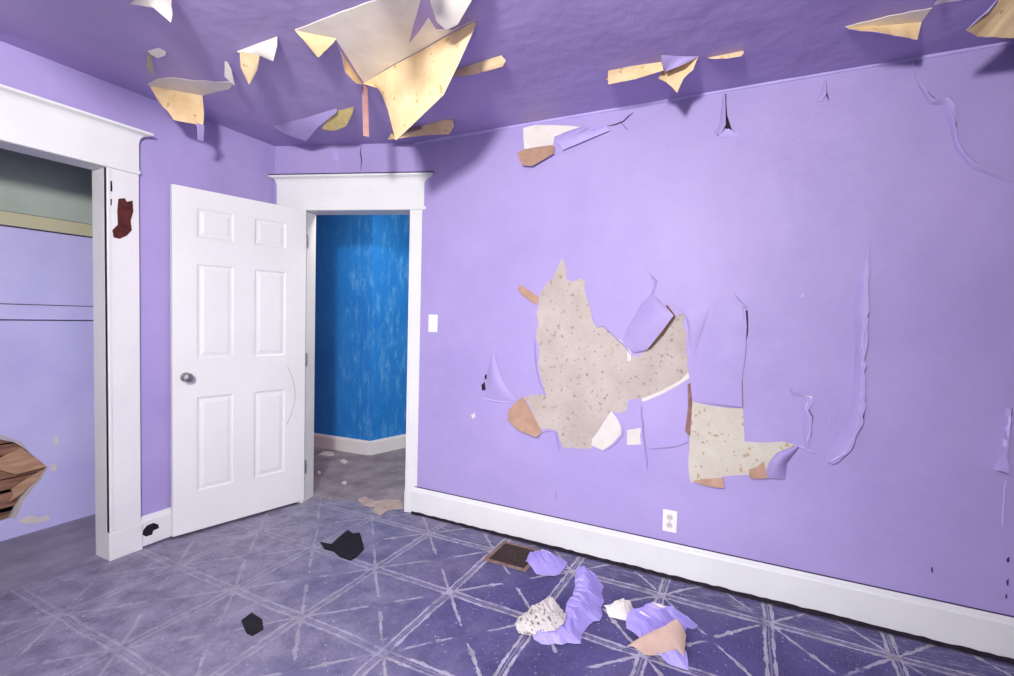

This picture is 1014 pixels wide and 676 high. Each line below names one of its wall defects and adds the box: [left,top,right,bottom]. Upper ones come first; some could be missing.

peeling [237,37,277,61]
flaking render [295,0,476,82]
flaking render [846,0,961,27]
flaking render [523,125,579,149]
crack [714,93,740,137]
crack [912,61,1014,183]
flaking render [524,258,689,449]
spalling [0,435,57,524]
flaking render [688,401,795,482]